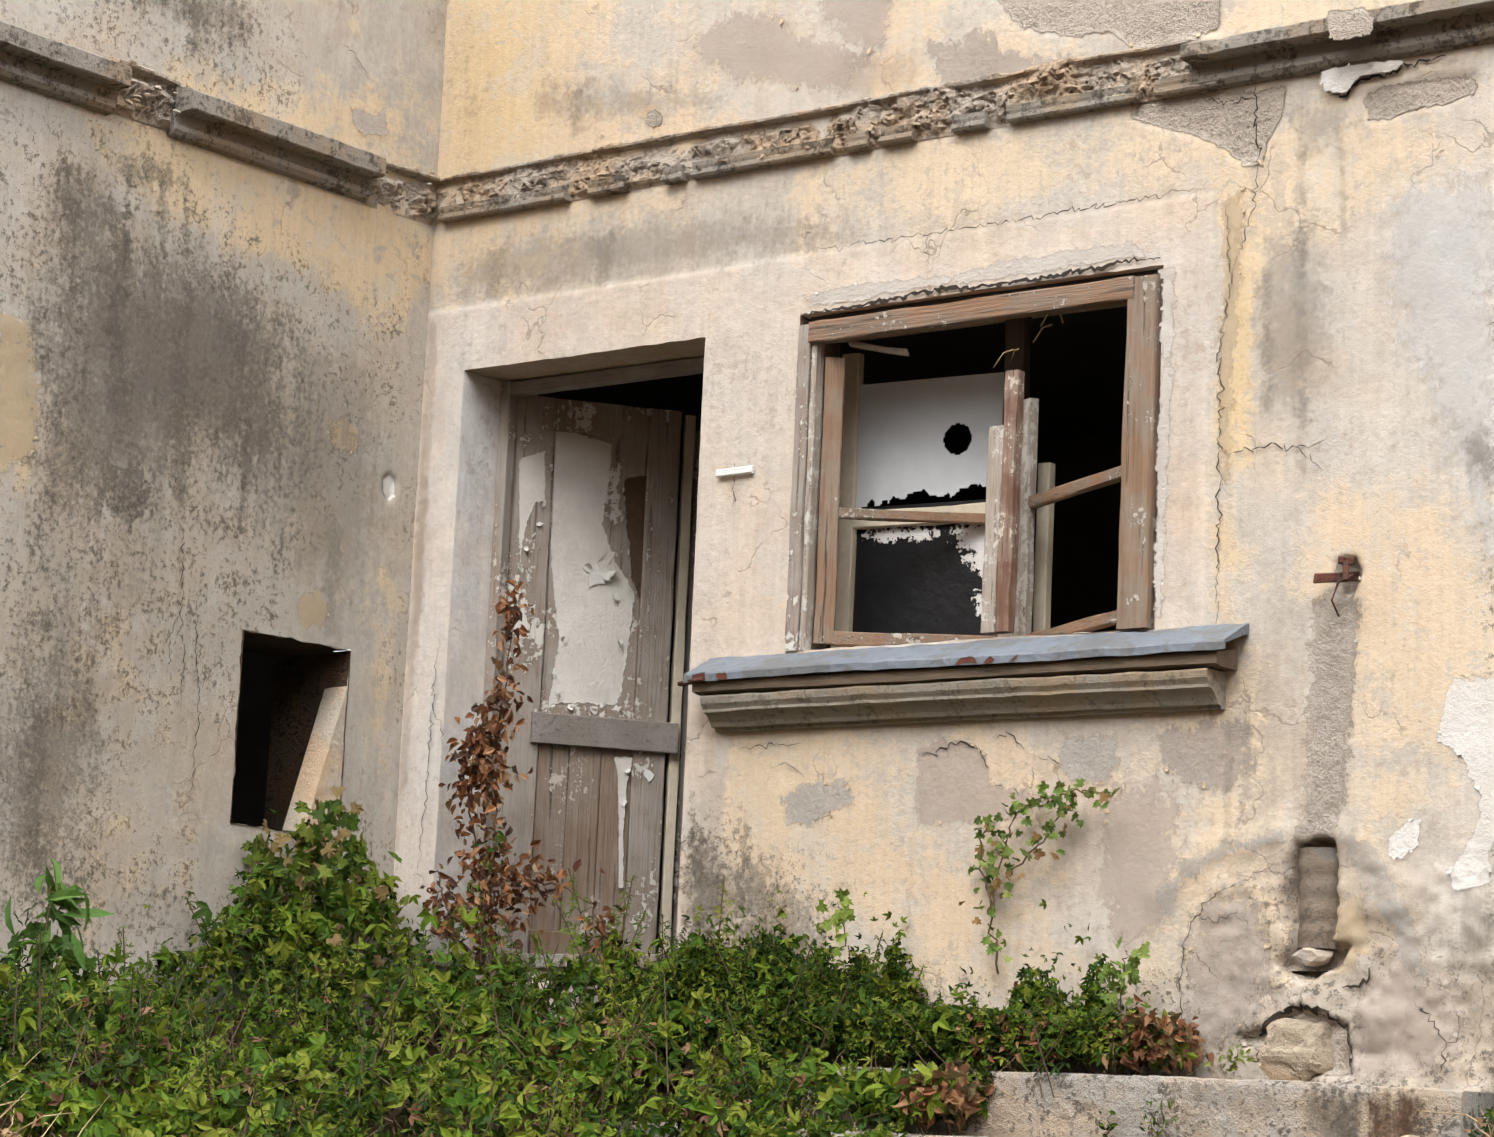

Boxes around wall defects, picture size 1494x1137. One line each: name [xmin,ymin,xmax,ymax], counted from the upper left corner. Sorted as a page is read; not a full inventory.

spalling [646,110,663,128]
spalling [1319,59,1478,121]
crack [803,87,1324,621]
spalling [382,475,396,501]
peeling [518,431,647,714]
peeling [1059,733,1121,784]
peeling [1156,716,1259,792]
spalling [1178,558,1463,1083]
peeling [1436,676,1494,891]